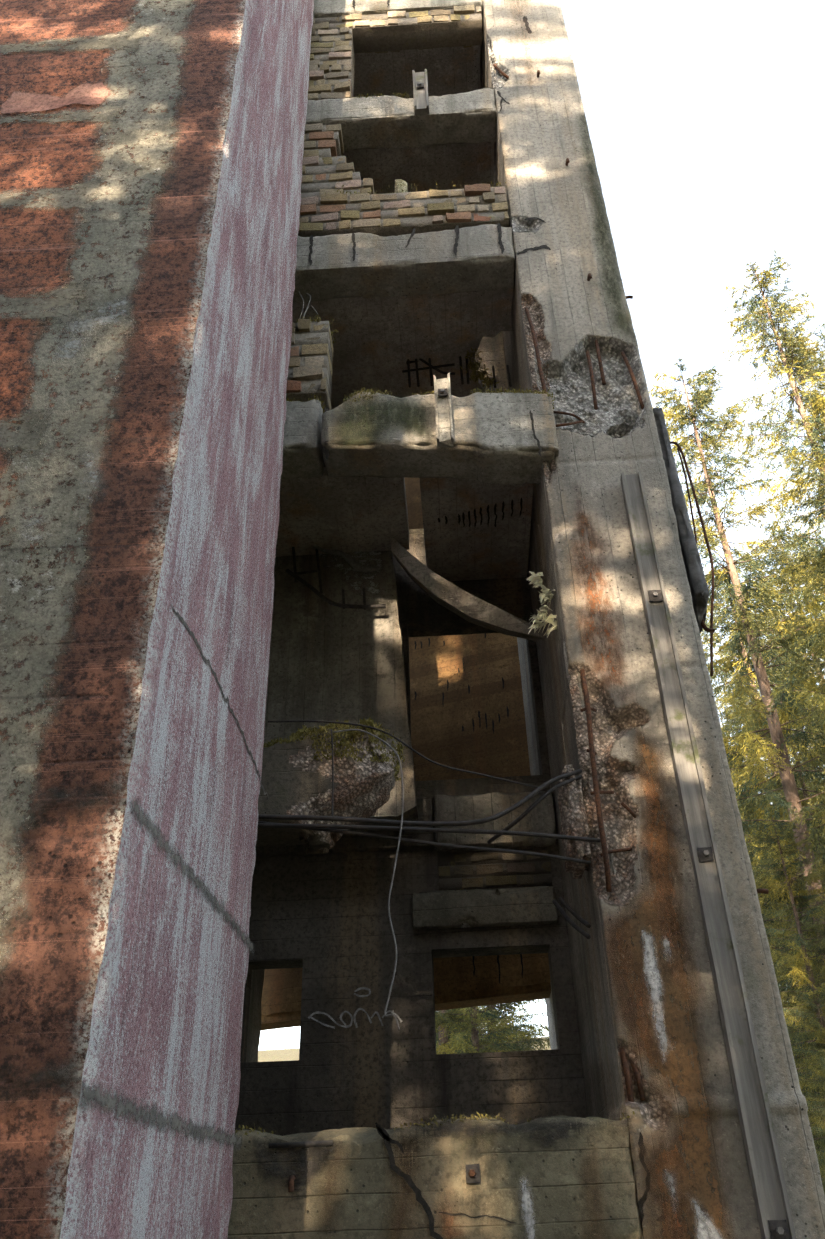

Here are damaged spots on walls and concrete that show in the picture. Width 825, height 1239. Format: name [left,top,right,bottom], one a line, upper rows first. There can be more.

spalling [402,356,469,388]
spalling [521,293,647,438]
spalling [543,455,556,486]
corrosion [575,512,623,685]
spalling [568,662,651,906]
corrosion [609,732,731,1239]
spalling [617,1038,672,1132]
crack [375,1122,515,1239]